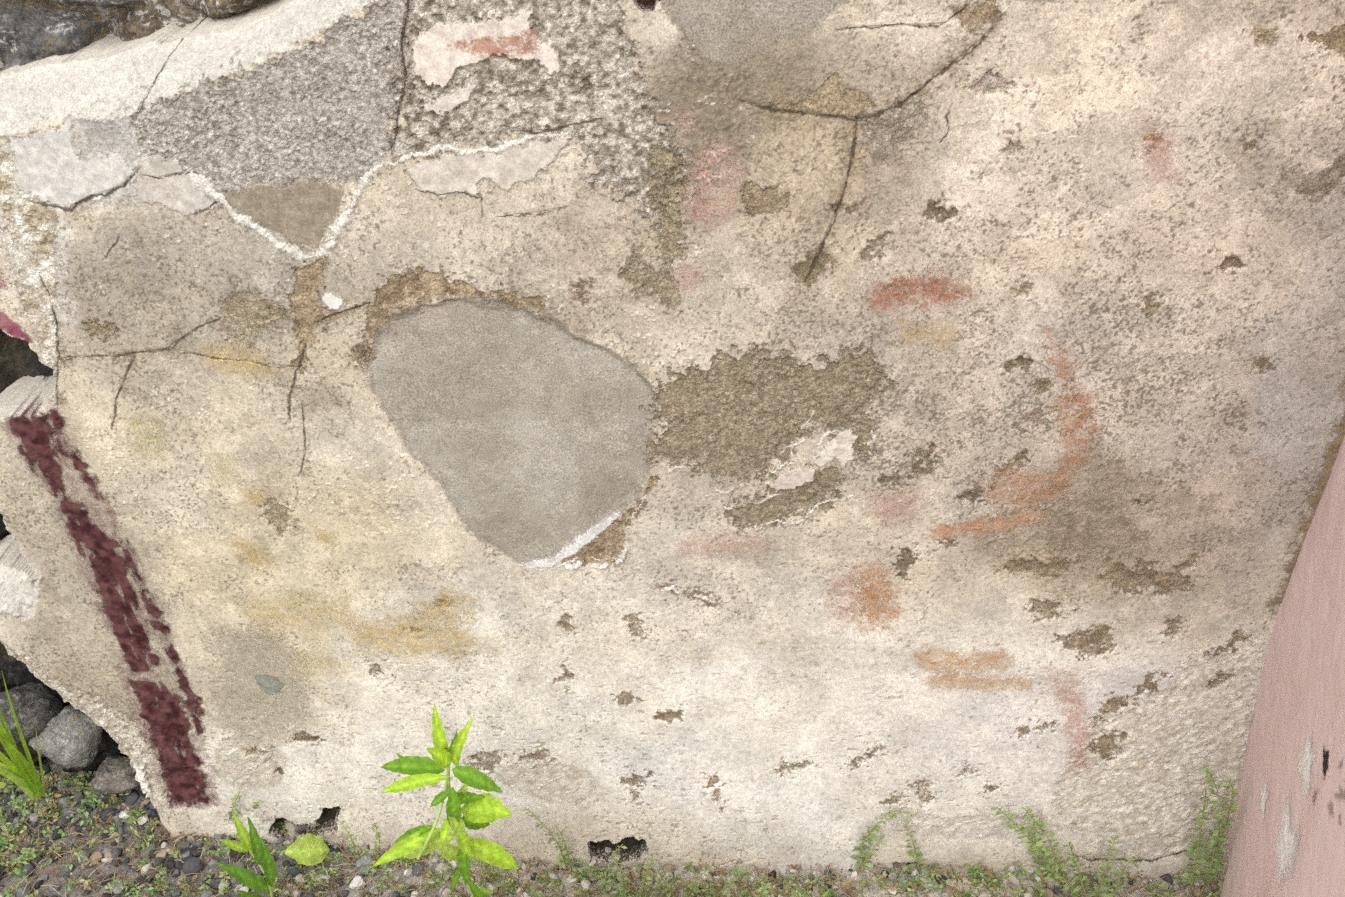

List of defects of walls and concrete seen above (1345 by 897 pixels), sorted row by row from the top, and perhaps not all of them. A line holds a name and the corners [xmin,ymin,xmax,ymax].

crack [26,168,197,212]
crack [391,0,410,151]
peeling [125,0,700,314]
crack [740,27,994,283]
crack [835,3,970,32]
crack [39,275,367,472]
spalling [514,342,948,571]